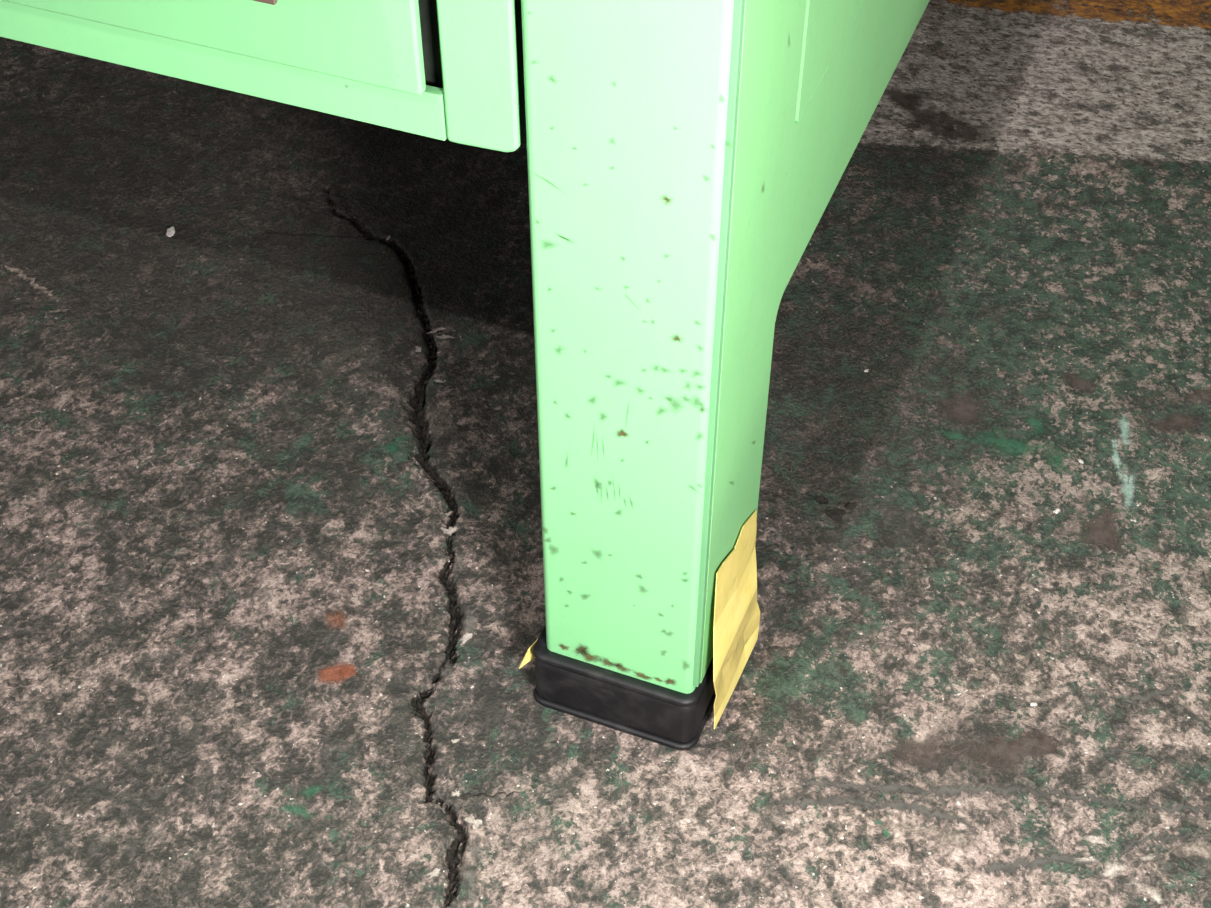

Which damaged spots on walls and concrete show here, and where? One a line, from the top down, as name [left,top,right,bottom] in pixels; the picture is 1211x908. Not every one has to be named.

rust [320,665,355,682]
crack [267,192,520,908]